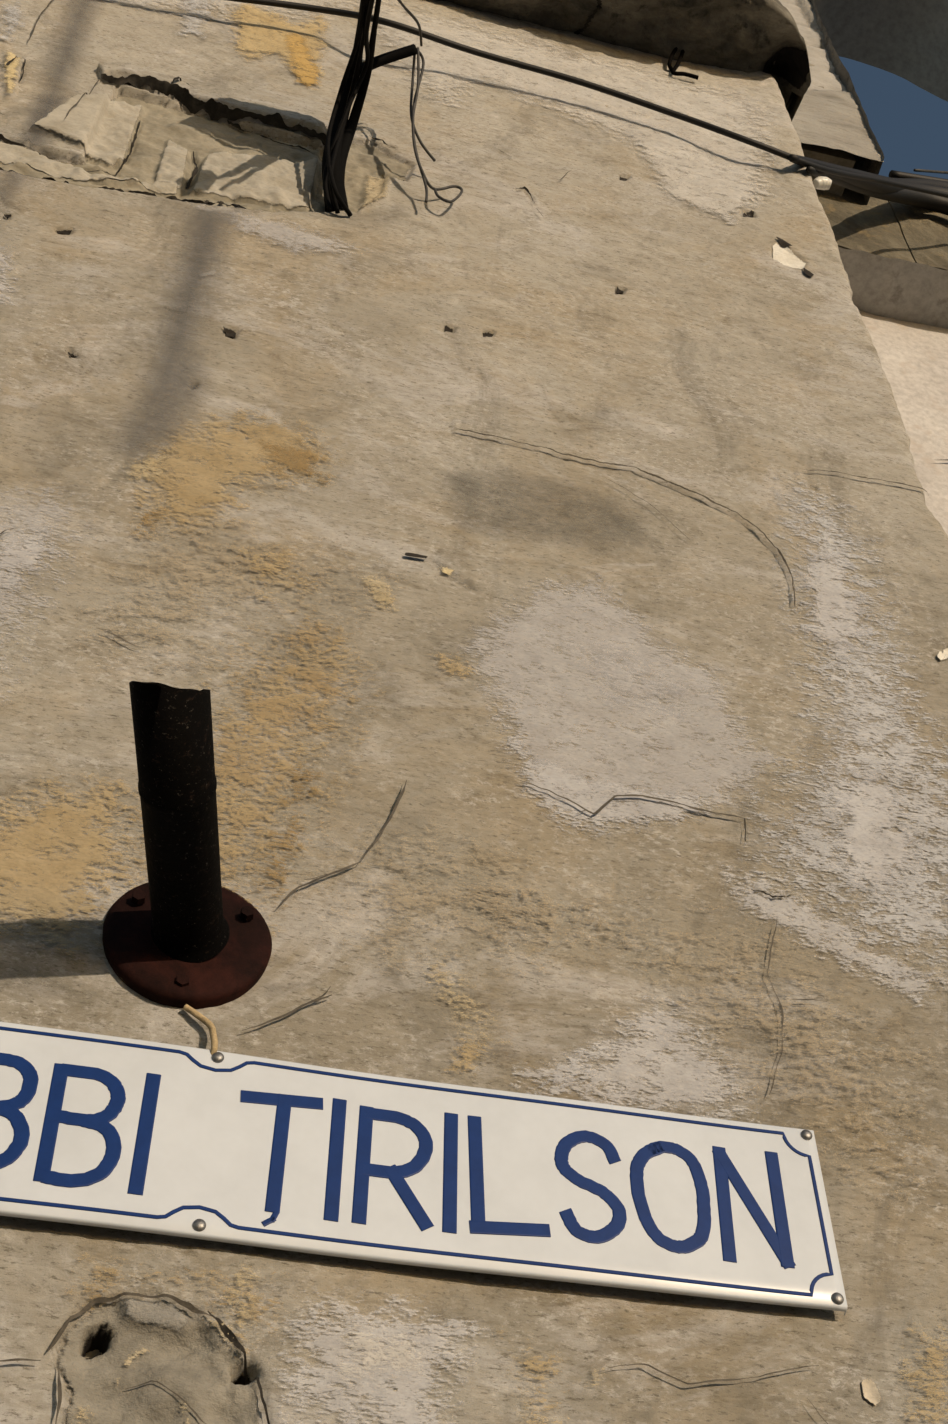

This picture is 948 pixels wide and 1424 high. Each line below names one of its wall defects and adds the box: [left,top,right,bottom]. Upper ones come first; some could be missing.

spalling [0,94,380,255]
peeling [103,0,782,224]
peeling [0,214,17,304]
crack [459,429,795,606]
corrosion [196,599,380,934]
spalling [59,1298,261,1424]
peeling [278,1292,485,1424]